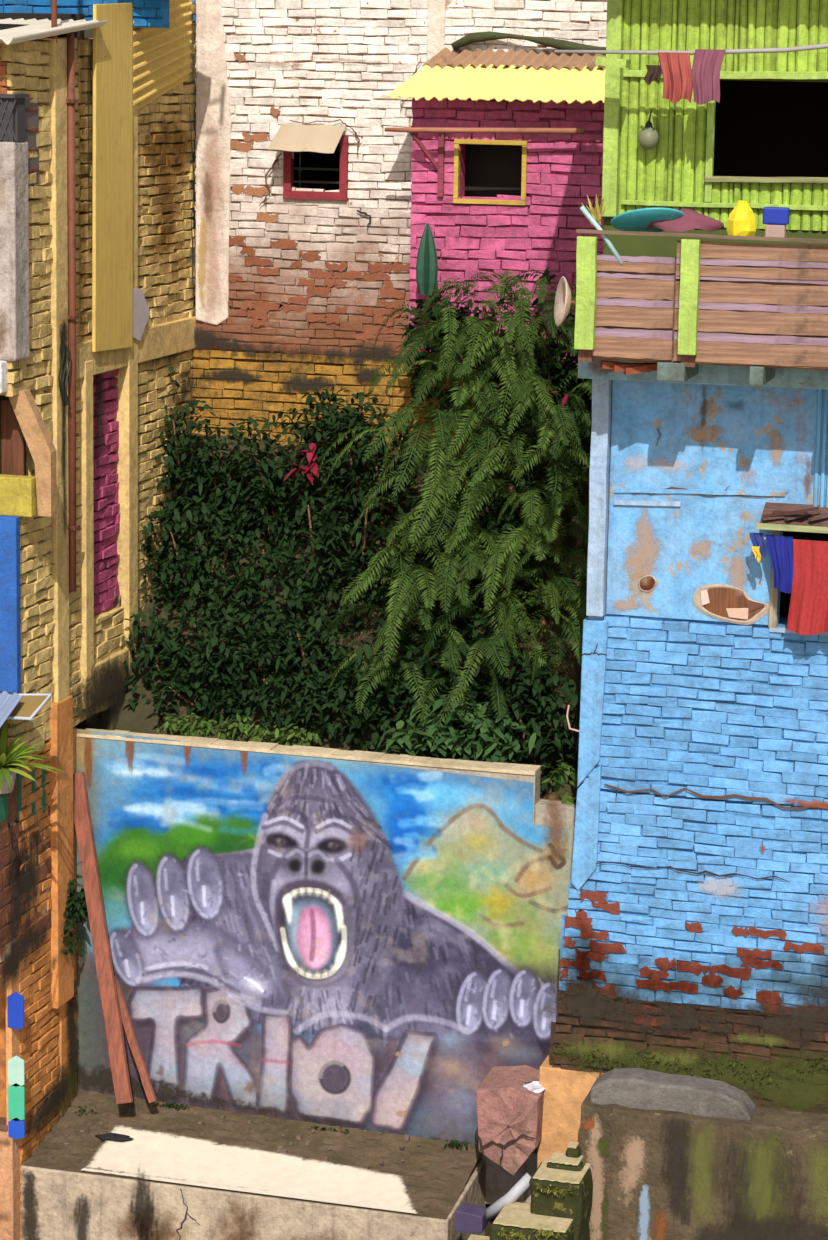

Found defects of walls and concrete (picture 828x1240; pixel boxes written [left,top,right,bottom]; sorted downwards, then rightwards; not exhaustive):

flaking render [230,131,269,152]
crack [290,119,360,155]
crack [259,153,282,206]
flaking render [228,235,410,351]
peeling [615,516,659,610]
spalling [693,556,769,625]
crack [604,784,812,810]
flaking render [559,889,665,1026]
flaking render [636,925,828,1042]
leakage [22,1173,40,1240]
leakage [74,1196,89,1240]
leakage [130,1170,158,1240]